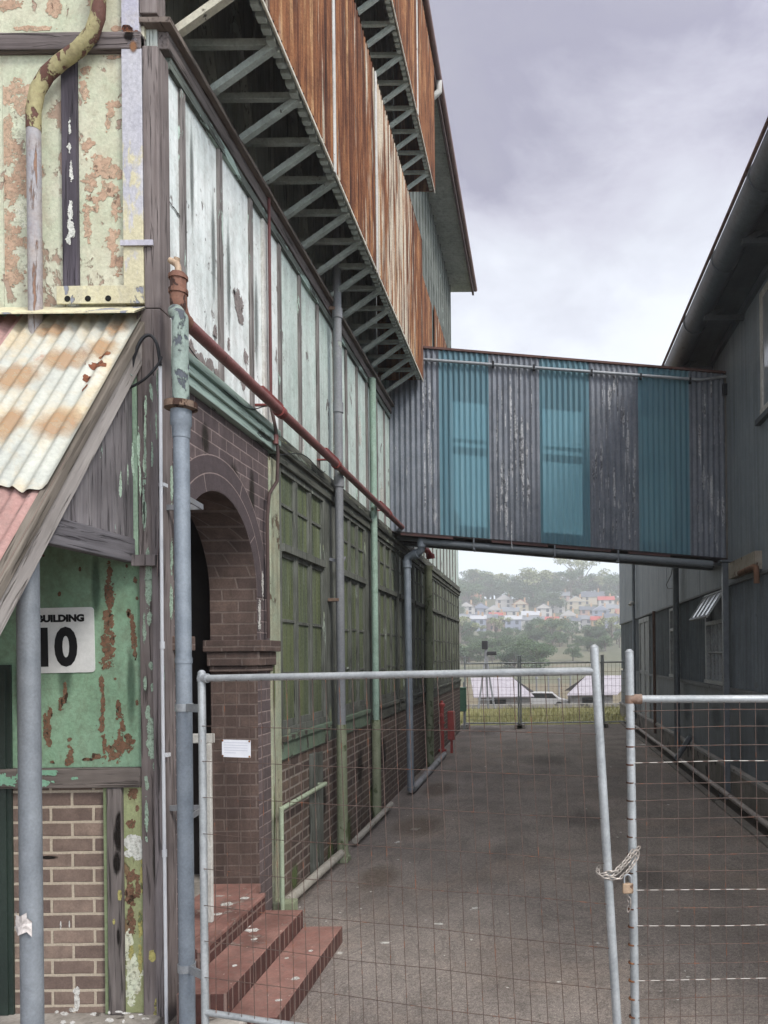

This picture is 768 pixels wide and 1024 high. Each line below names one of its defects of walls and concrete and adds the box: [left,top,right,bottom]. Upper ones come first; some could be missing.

peeling [105,100,122,133]
peeling [3,77,30,288]
peeling [65,120,124,277]
rust [40,323,64,335]
peeling [233,288,244,325]
rust [422,276,447,348]
rust [47,323,123,392]
rust [0,366,33,387]
rust [0,411,22,436]
rust [41,412,76,435]
peeling [0,773,18,787]
spalling [42,547,154,1007]